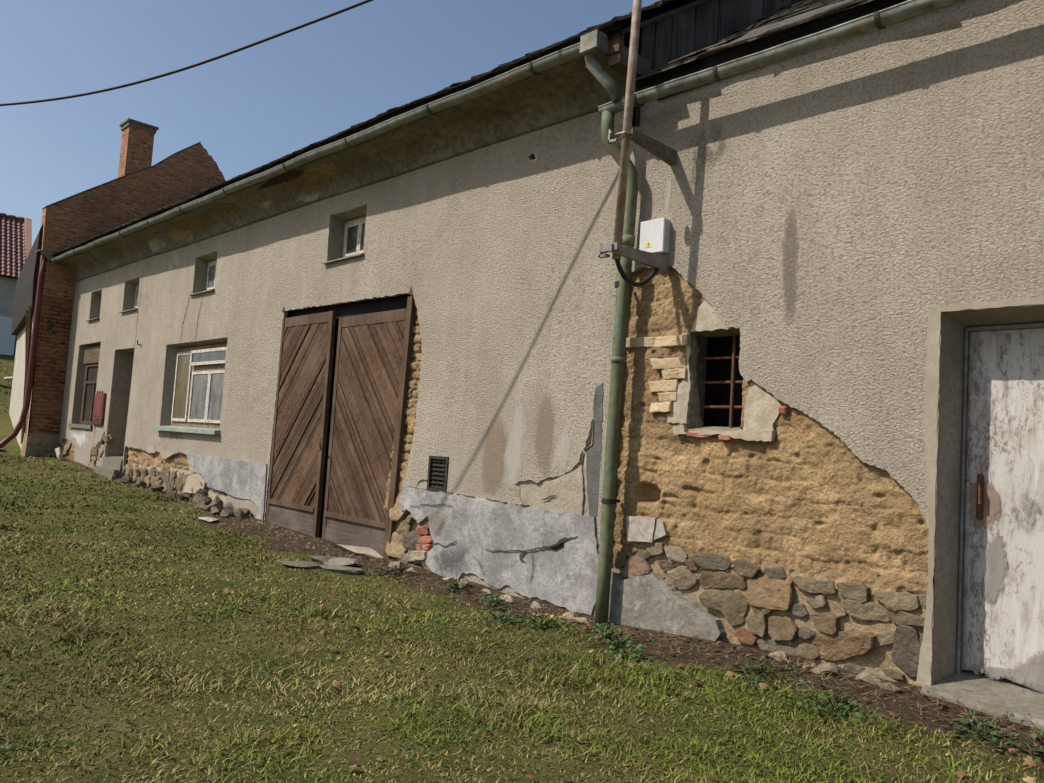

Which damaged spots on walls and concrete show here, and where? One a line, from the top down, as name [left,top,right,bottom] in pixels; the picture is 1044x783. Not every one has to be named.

leakage [783,217,796,311]
spalling [122,447,227,506]
spalling [383,311,433,571]
leakage [484,425,504,492]
crack [408,419,594,508]
leakage [536,399,552,472]
spalling [608,267,937,687]